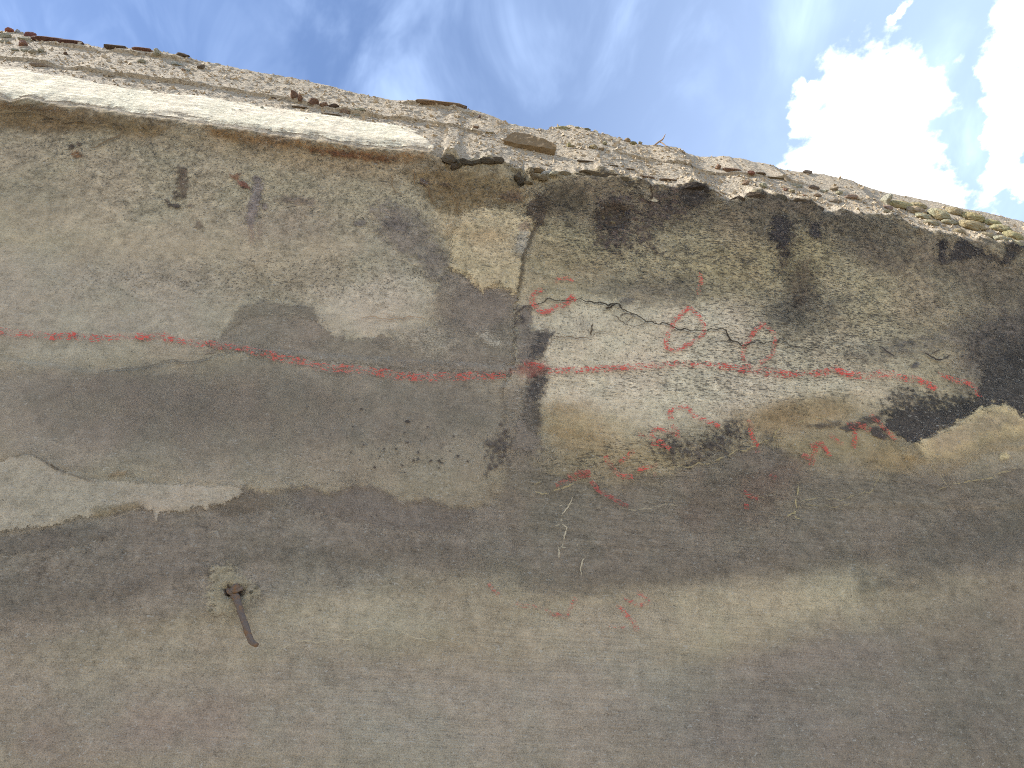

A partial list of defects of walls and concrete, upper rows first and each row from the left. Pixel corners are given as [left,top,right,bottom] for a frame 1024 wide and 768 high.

water stain [0,165,1024,608]
crack [502,217,827,414]